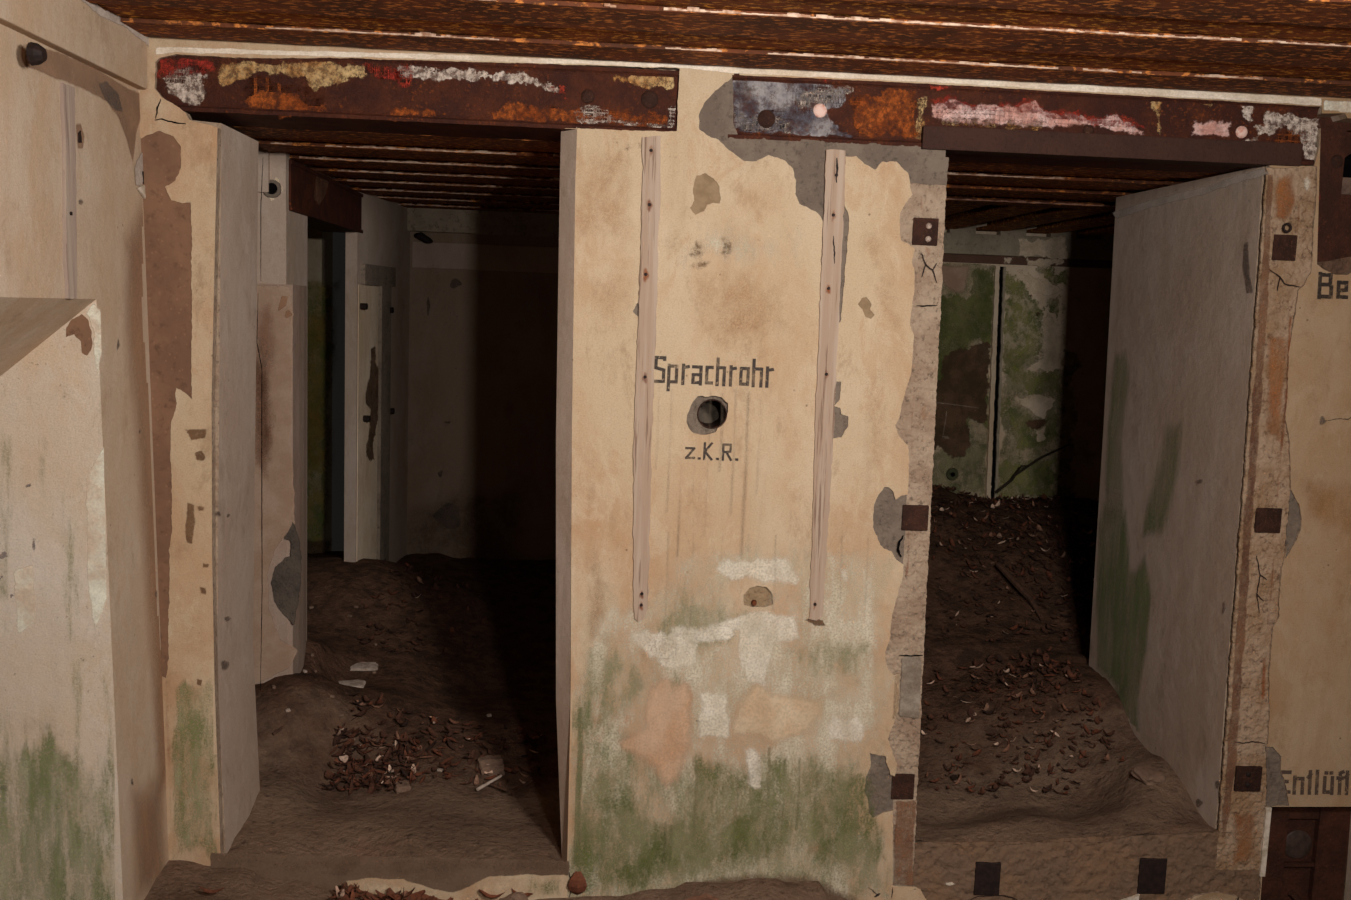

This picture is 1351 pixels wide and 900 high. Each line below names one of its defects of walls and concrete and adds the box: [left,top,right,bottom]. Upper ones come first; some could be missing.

peeling [690,173,721,215]
peeling [137,131,230,678]
peeling [253,285,302,684]
flaking render [686,396,728,434]
flaking render [699,73,1351,900]